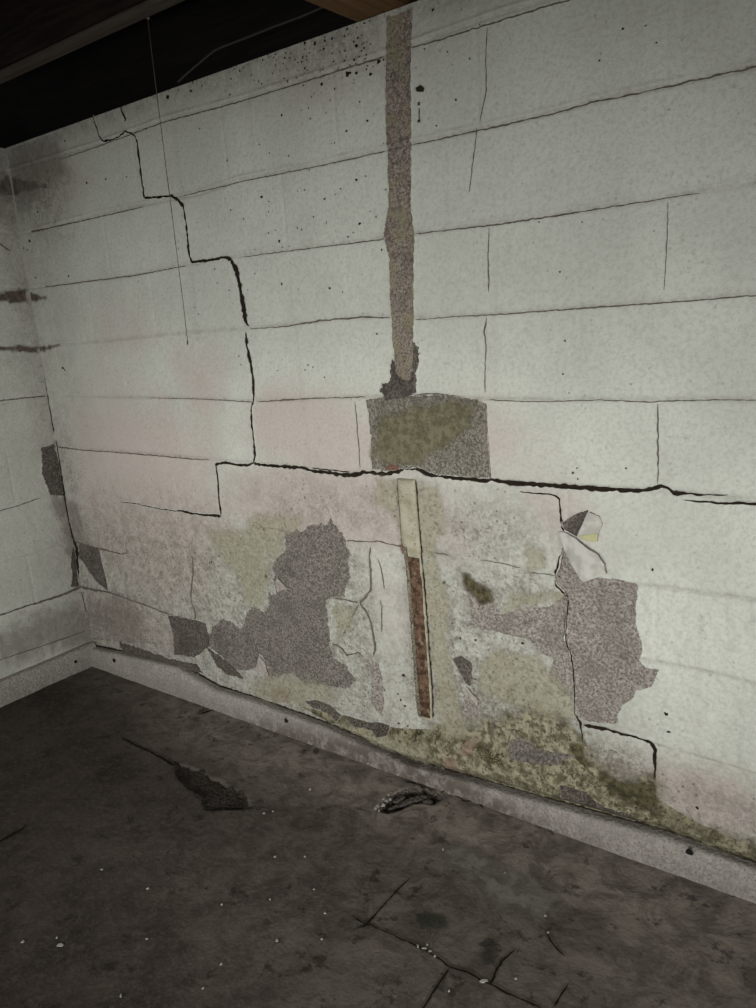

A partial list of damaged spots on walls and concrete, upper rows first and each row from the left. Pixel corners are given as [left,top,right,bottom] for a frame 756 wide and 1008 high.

crack [411,0,756,191]
peeling [365,6,491,479]
peeling [39,442,64,498]
peeling [69,541,109,591]
peeling [119,516,391,738]
crack [0,56,756,805]
rust [385,465,434,721]
peeling [451,654,474,688]
crack [192,671,756,863]
peeling [459,508,661,725]